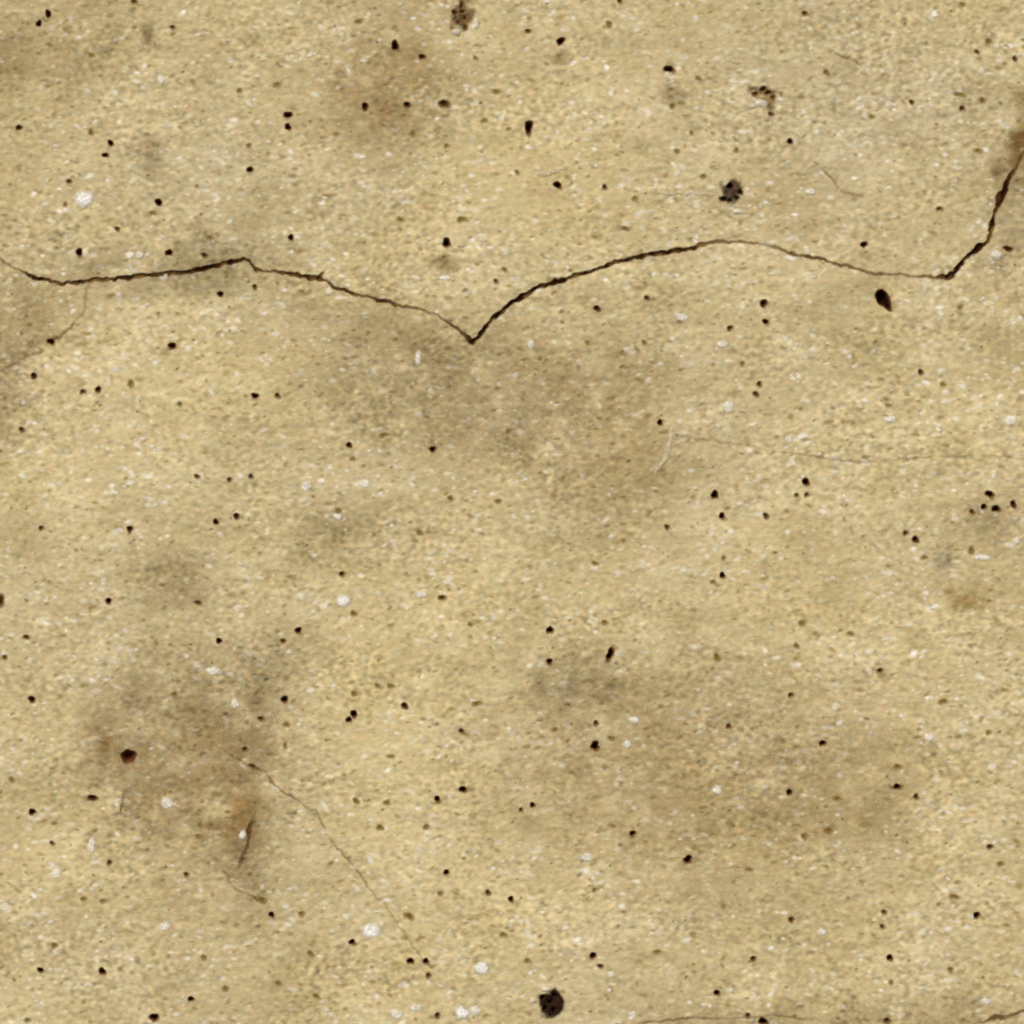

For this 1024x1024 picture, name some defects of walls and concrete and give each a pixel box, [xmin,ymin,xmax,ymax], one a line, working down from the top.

crack [22,257,420,309]
crack [445,151,1024,345]